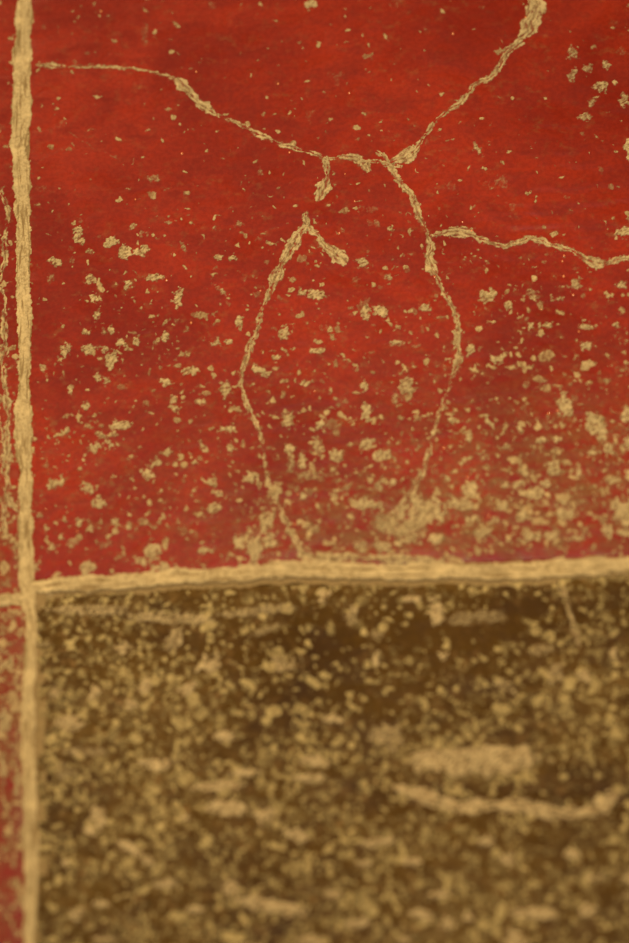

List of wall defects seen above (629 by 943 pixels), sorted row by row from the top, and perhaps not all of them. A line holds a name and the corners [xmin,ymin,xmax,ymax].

spalling [105,236,150,260]
crack [36,0,629,566]
spalling [360,305,388,320]
crack [0,189,19,540]
spalling [60,325,139,384]
spalling [88,420,133,454]
spalling [284,419,343,479]
spalling [556,392,629,457]
spalling [352,478,587,558]
spalling [501,460,575,521]
water stain [561,586,581,647]
water stain [392,784,621,820]